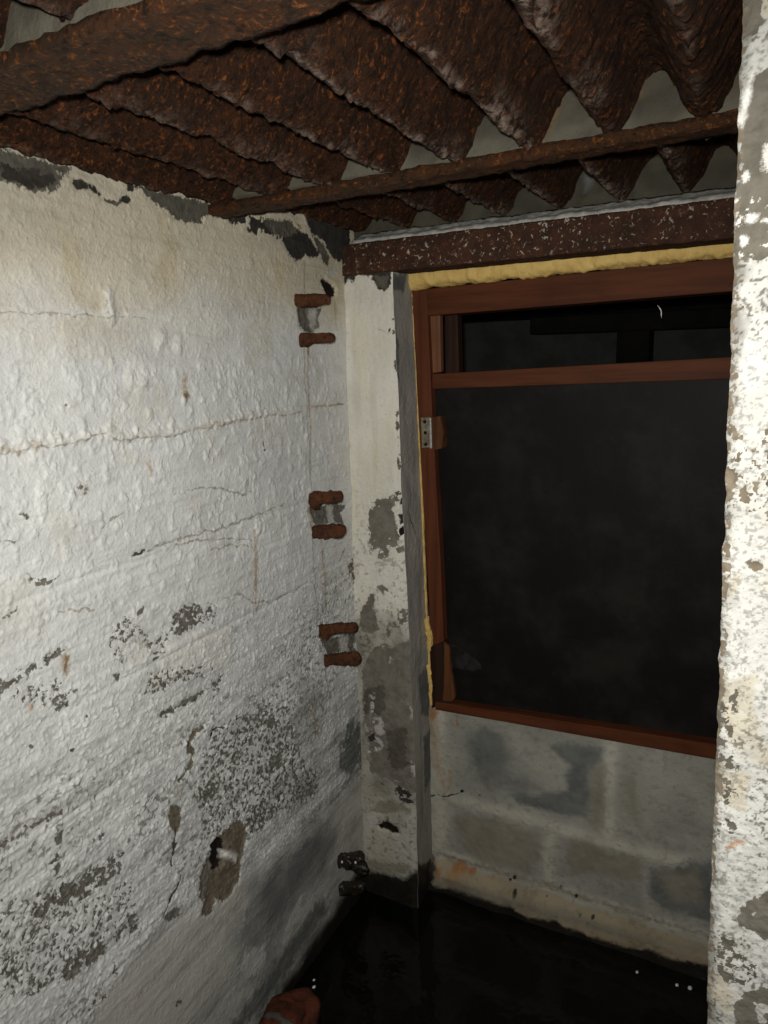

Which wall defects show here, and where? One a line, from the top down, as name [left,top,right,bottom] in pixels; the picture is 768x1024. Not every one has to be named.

rust [544,97,567,141]
peeling [722,0,768,600]
peeling [368,491,405,559]
peeling [318,584,416,804]
damp [418,667,430,716]
peeling [192,702,320,917]
spalling [366,815,399,833]
damp [225,716,712,1024]
peeling [707,627,768,1024]